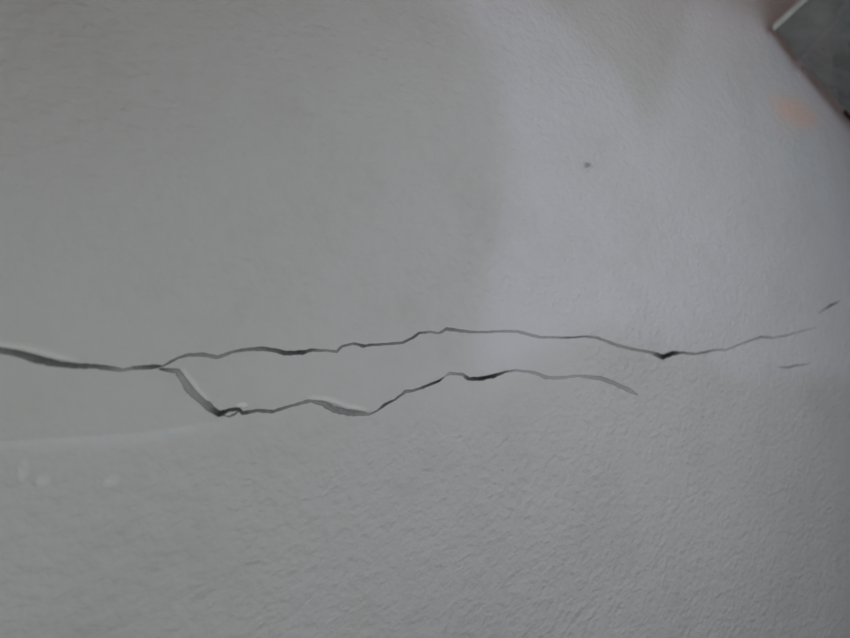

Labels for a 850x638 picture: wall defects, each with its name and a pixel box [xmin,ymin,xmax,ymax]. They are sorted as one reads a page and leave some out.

crack [0,301,840,417]